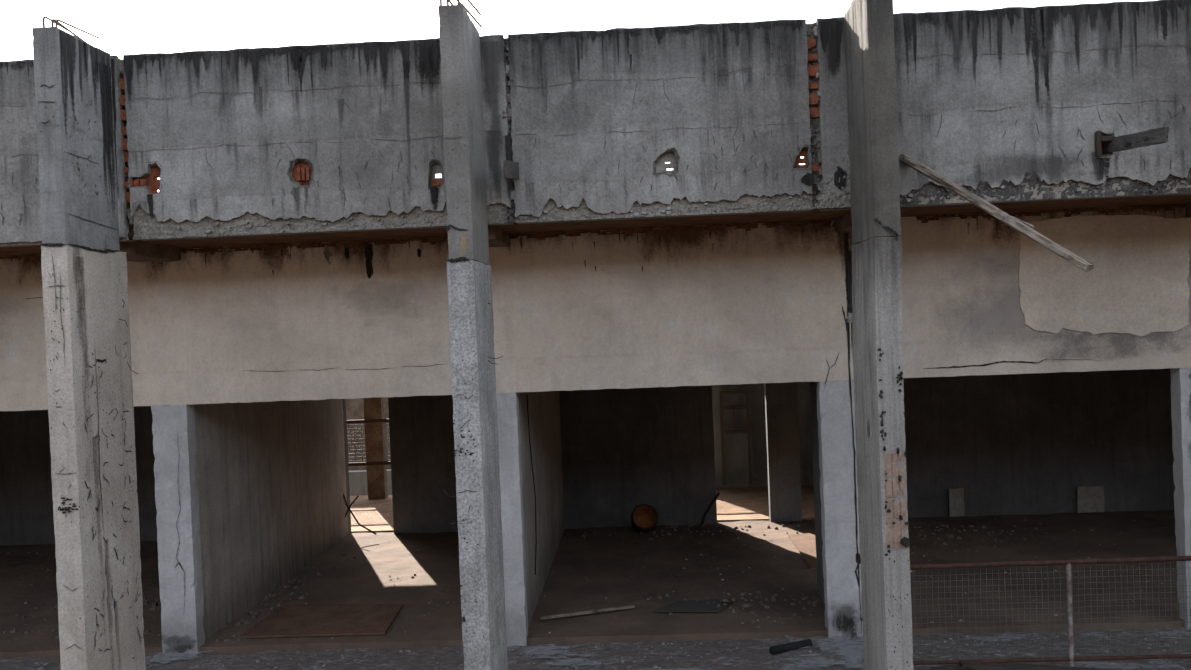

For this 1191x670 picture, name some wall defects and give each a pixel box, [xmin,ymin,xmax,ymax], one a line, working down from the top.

water stain [0,60,34,75]
water stain [819,0,873,75]
water stain [903,0,1190,103]
water stain [60,30,441,210]
water stain [483,19,802,198]
spalling [128,161,162,197]
spalling [119,205,447,241]
spalling [428,159,444,190]
spalling [487,145,851,224]
spalling [900,167,1191,206]
peeling [1018,214,1190,336]
crack [923,359,1098,369]